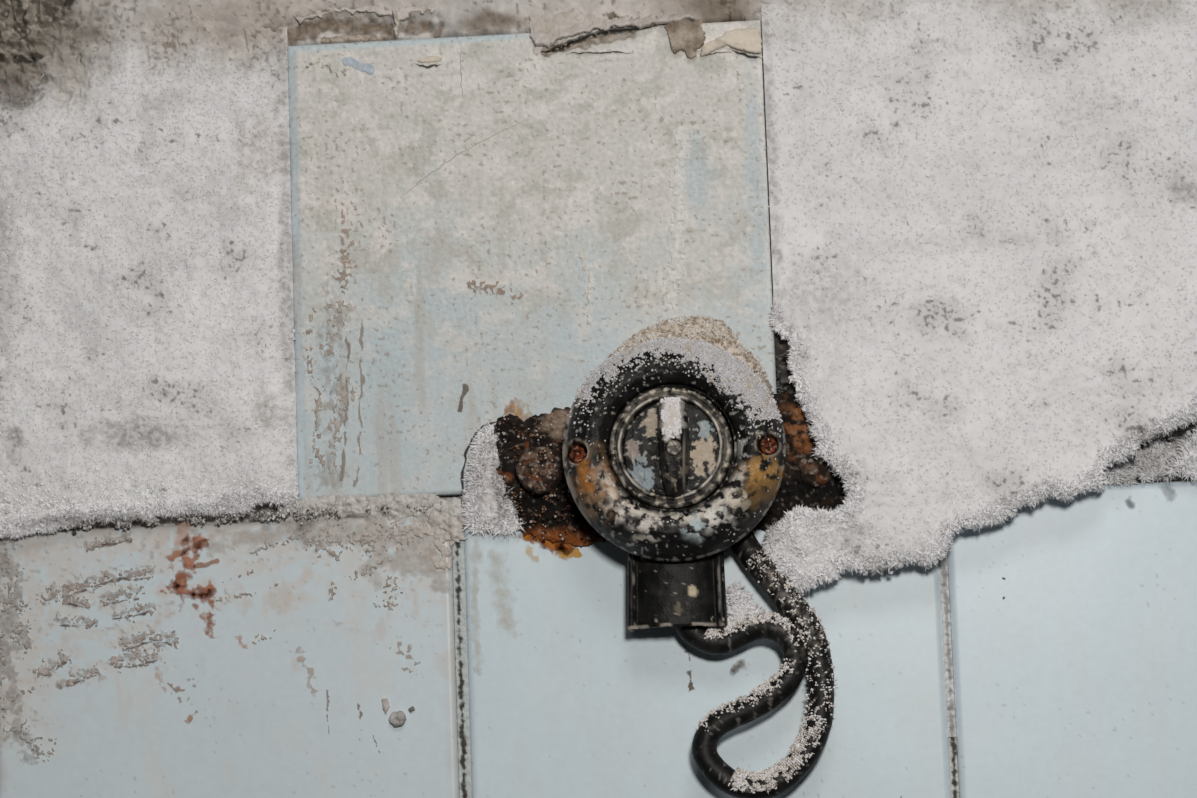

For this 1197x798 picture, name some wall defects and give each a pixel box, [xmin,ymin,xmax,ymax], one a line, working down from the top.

spalling [263,5,442,77]
peeling [664,19,762,59]
leakage [775,351,798,406]
rust [497,403,591,560]
rust [160,521,219,637]